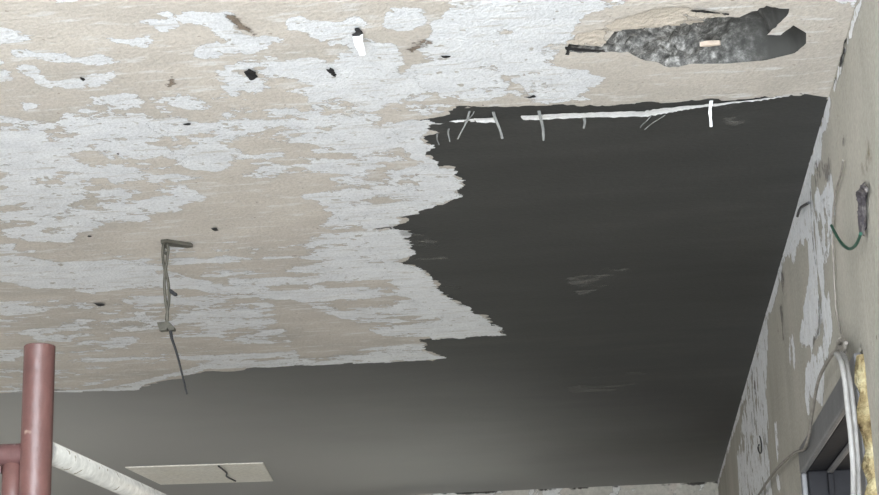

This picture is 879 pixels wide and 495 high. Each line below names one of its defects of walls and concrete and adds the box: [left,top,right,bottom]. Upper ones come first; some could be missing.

peeling [0,0,806,392]
peeling [718,96,835,495]
spalling [856,182,868,236]